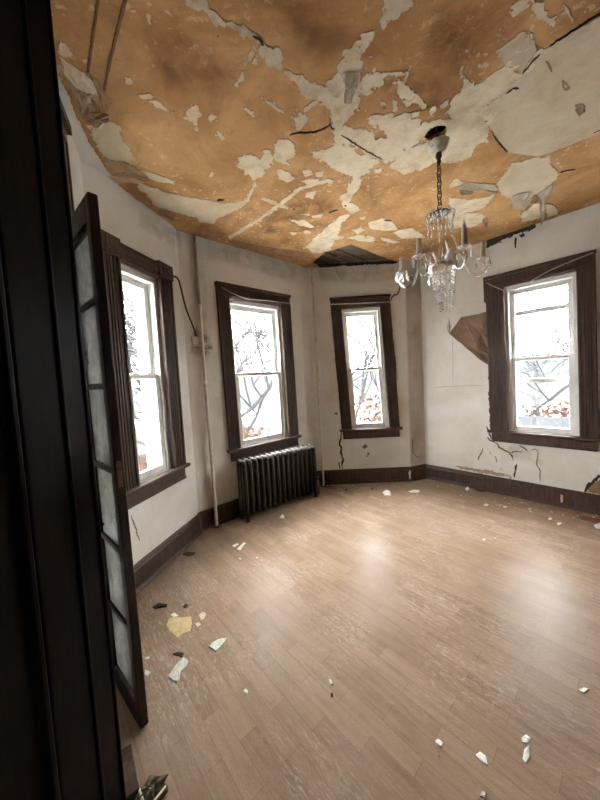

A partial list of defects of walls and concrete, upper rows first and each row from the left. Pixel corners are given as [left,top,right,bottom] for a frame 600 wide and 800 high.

peeling [509,0,574,28]
peeling [57,40,87,63]
crack [506,13,600,94]
flaking render [57,68,118,185]
peeling [139,93,225,140]
crack [290,121,382,159]
peeling [184,0,559,268]
peeling [139,170,176,185]
crack [337,405,345,469]
crack [435,377,541,480]